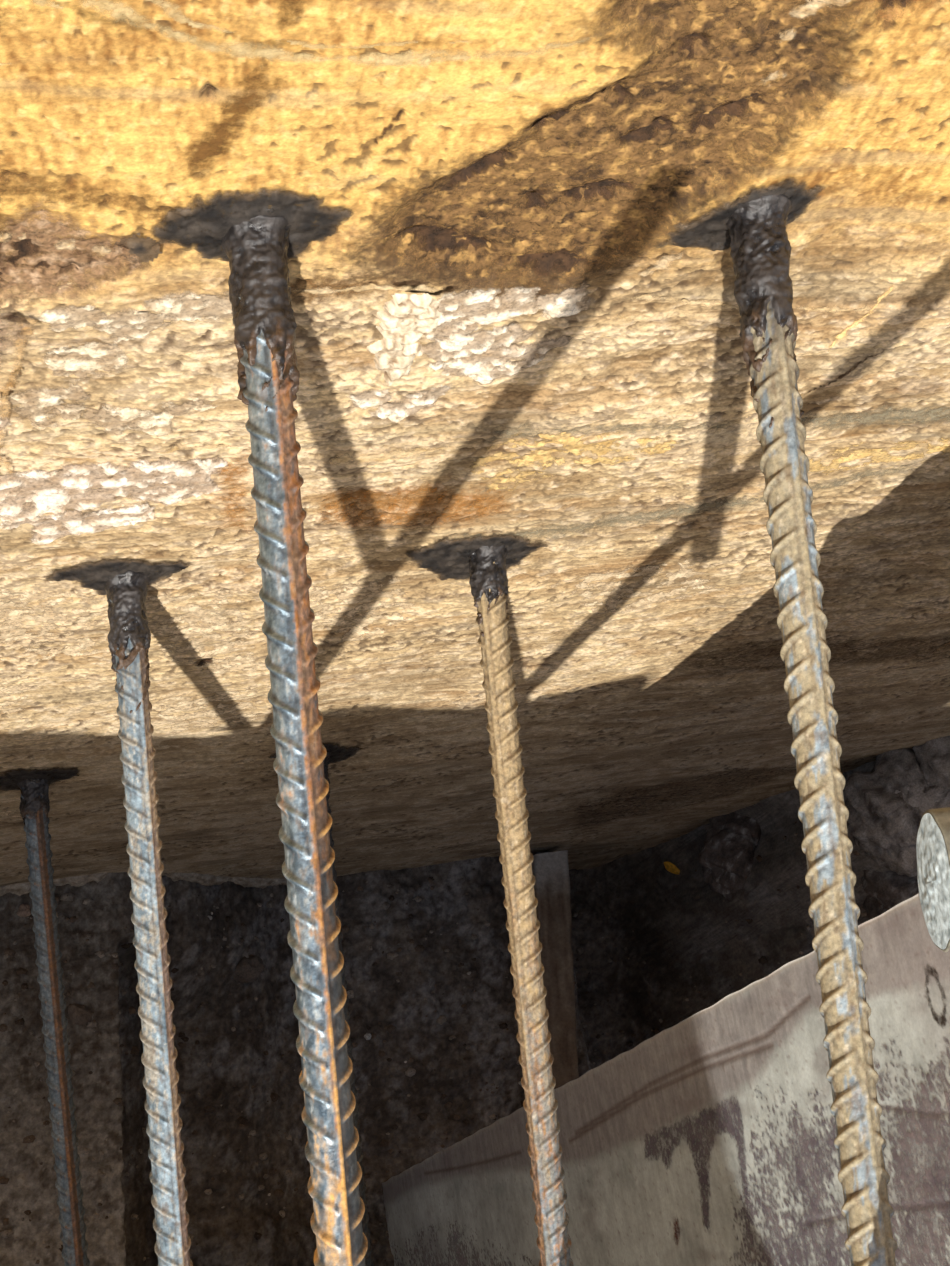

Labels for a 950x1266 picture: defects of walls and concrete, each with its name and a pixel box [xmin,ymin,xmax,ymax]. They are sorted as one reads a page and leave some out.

damp [348,41,470,66]
damp [501,0,694,161]
damp [0,172,175,217]
damp [290,112,796,303]
damp [638,295,736,308]
rust [327,487,500,527]